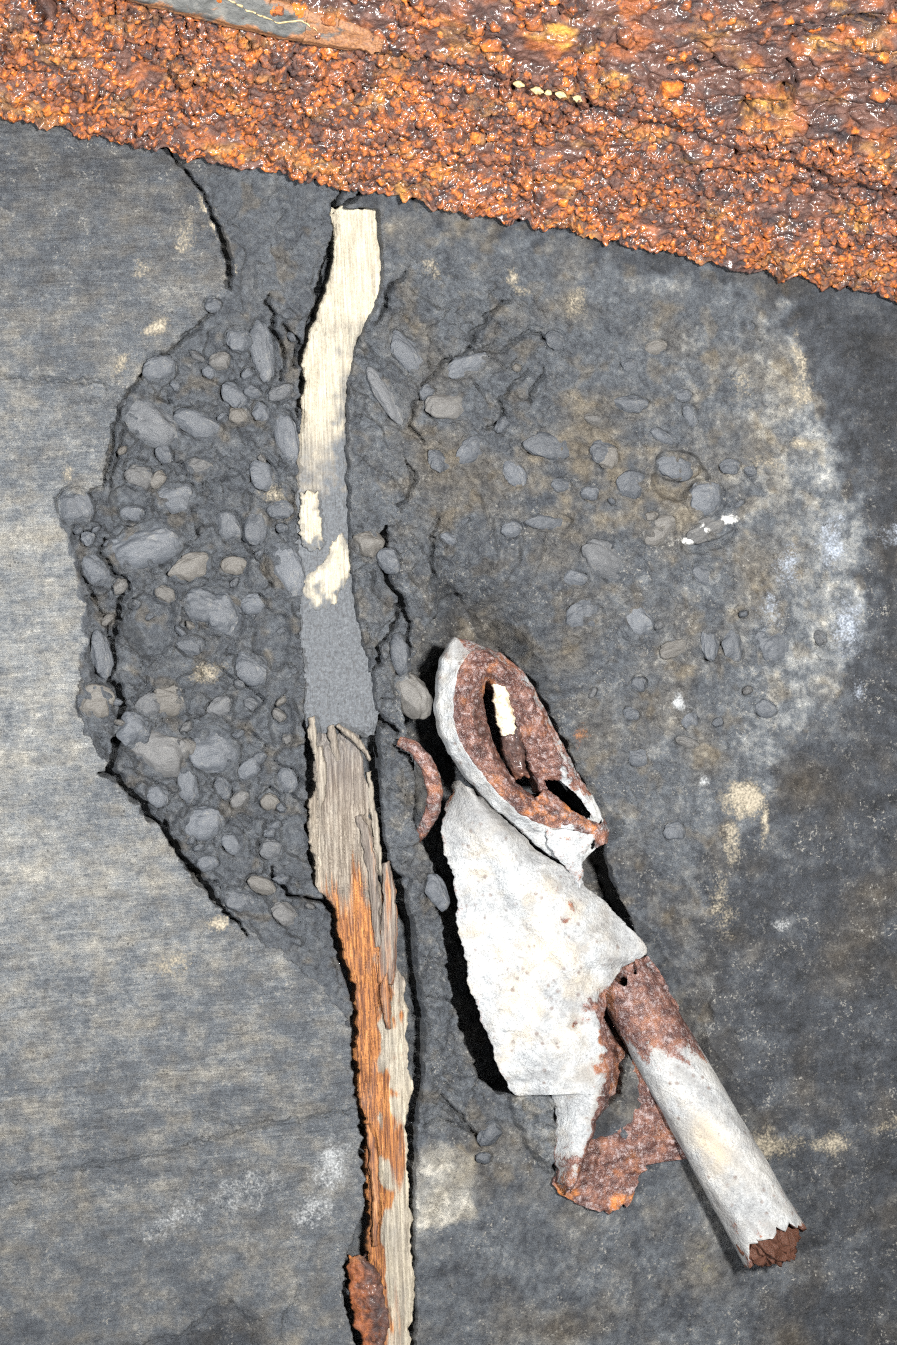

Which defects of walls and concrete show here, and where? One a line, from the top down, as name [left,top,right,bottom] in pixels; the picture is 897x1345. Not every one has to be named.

corrosion [0,0,897,303]
crack [359,299,548,1345]
spalling [57,169,876,1189]
corrosion [453,652,593,831]
crack [0,865,366,1345]